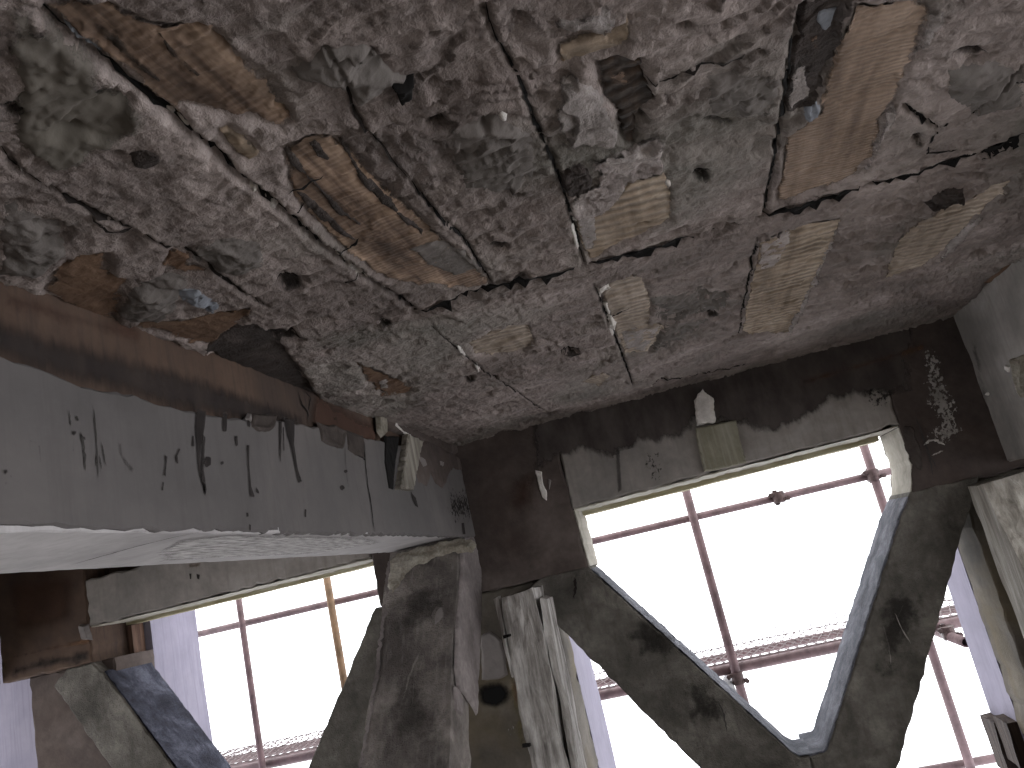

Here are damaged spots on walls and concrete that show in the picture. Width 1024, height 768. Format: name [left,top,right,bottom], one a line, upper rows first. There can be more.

crack [43,3,68,27]
crack [1,146,264,304]
peeling [52,0,291,159]
peeling [284,134,488,288]
crack [97,2,1024,409]
peeling [555,6,671,258]
peeling [602,275,664,353]
peeling [743,219,840,335]
peeling [777,0,944,200]
peeling [886,180,1010,277]
water stain [0,325,302,497]
efflorescence [924,350,963,443]